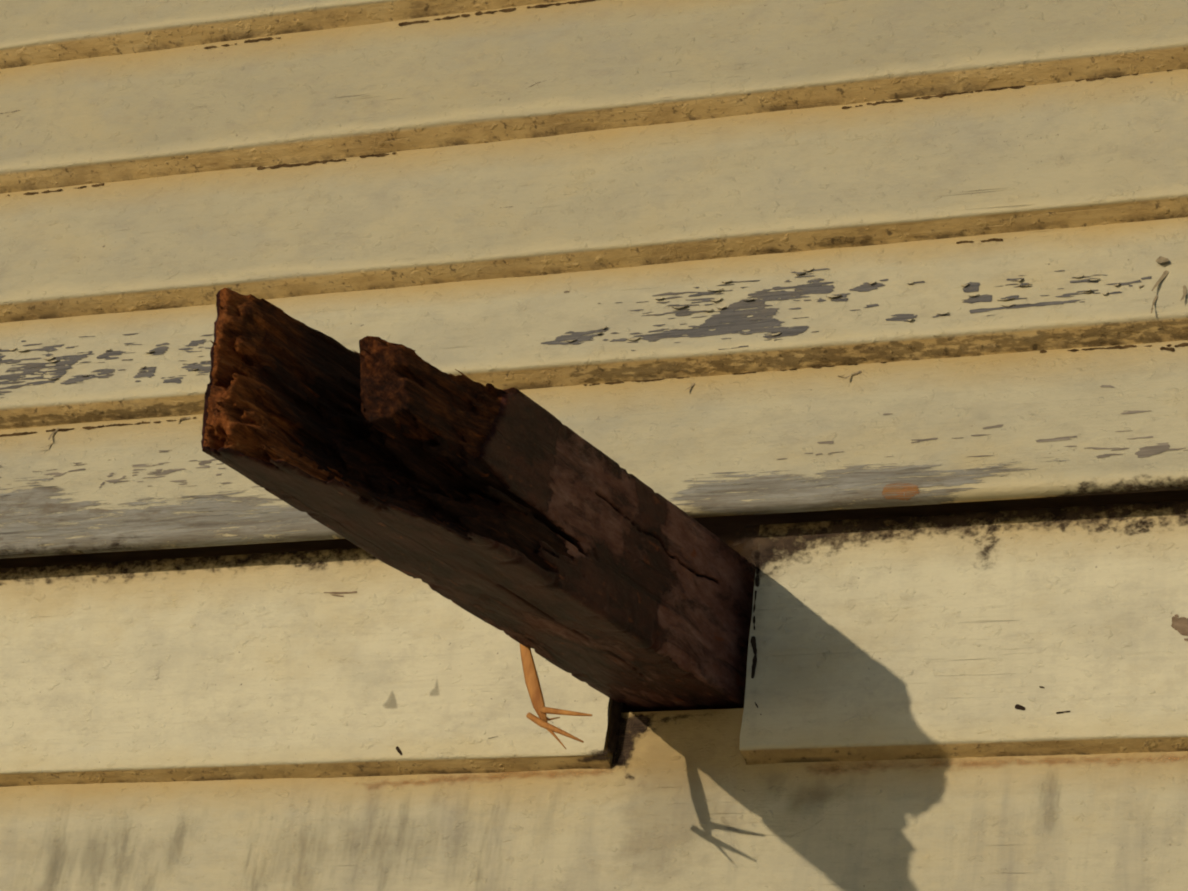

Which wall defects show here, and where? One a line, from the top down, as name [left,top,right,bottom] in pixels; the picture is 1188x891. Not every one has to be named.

peeling [540,268,888,351]
peeling [885,314,917,322]
peeling [959,256,1169,316]
peeling [0,333,214,398]
peeling [1035,430,1187,462]
peeling [0,450,344,559]
peeling [671,455,1033,515]
damp [0,548,376,585]
damp [734,500,1188,580]